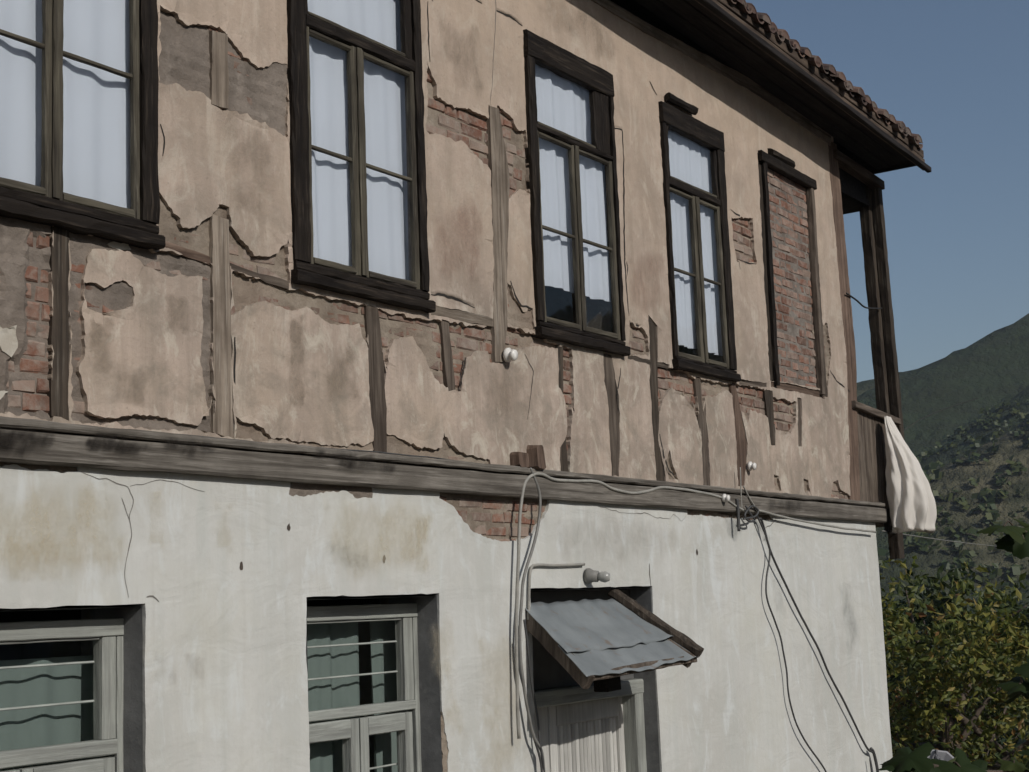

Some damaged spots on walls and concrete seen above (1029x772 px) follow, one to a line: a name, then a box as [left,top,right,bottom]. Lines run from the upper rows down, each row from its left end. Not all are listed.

spalling [158,10,288,136]
crack [426,0,434,62]
spalling [426,73,488,165]
crack [476,0,523,103]
spalling [497,107,526,197]
spalling [0,216,52,421]
spalling [68,198,366,437]
spalling [378,309,505,391]
spalling [658,368,793,432]
crack [83,472,205,602]
spalling [289,483,373,499]
spalling [439,493,547,541]